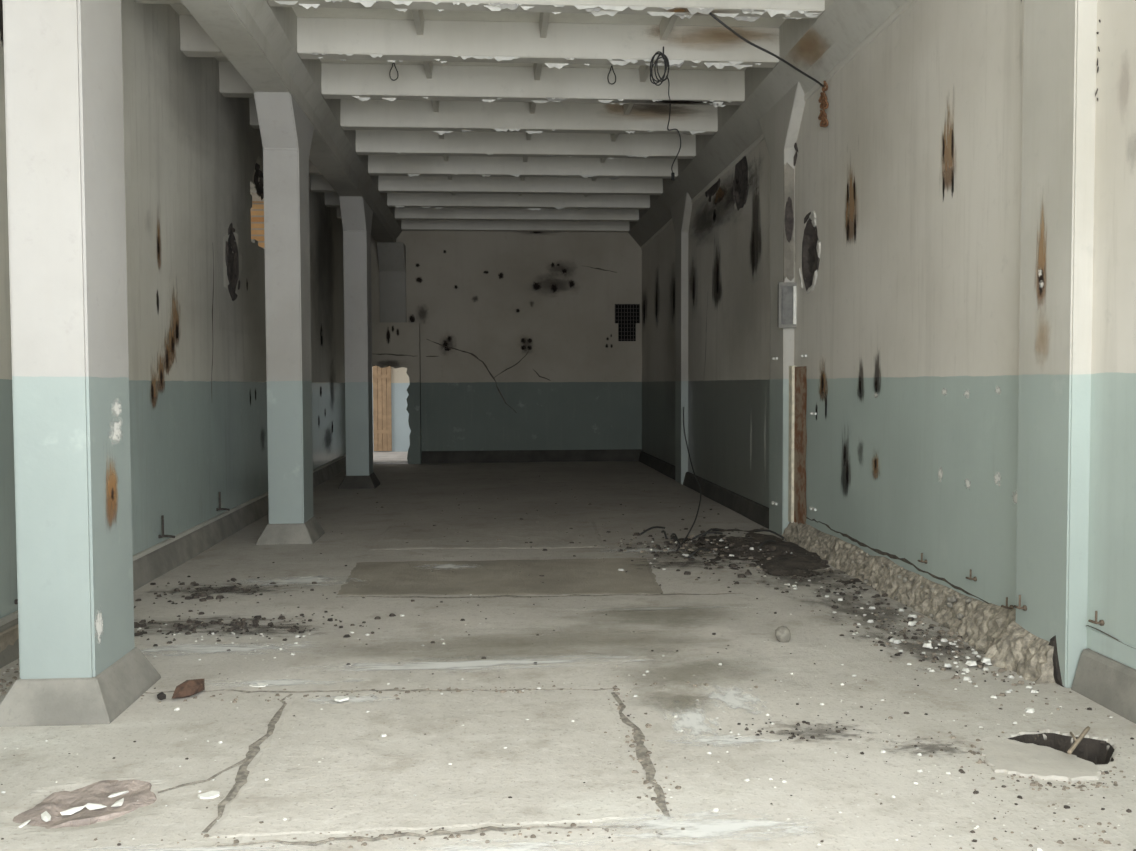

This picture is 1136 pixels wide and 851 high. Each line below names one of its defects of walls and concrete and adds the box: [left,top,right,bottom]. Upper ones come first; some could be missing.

rust [942,107,954,198]
spalling [225,223,240,301]
spalling [783,143,821,294]
rust [845,177,856,240]
rust [1037,207,1046,301]
rust [151,291,179,407]
rust [106,466,117,526]
crack [158,688,671,846]
spalling [1008,733,1114,765]